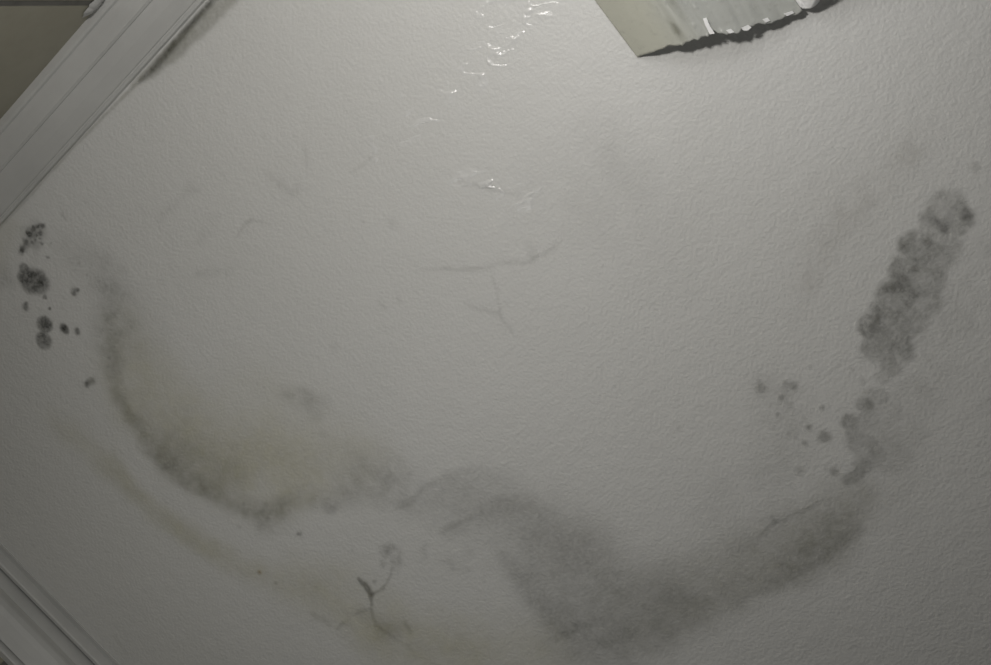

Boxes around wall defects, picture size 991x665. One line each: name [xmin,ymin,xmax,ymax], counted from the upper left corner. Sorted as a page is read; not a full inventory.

peeling [595,0,820,57]